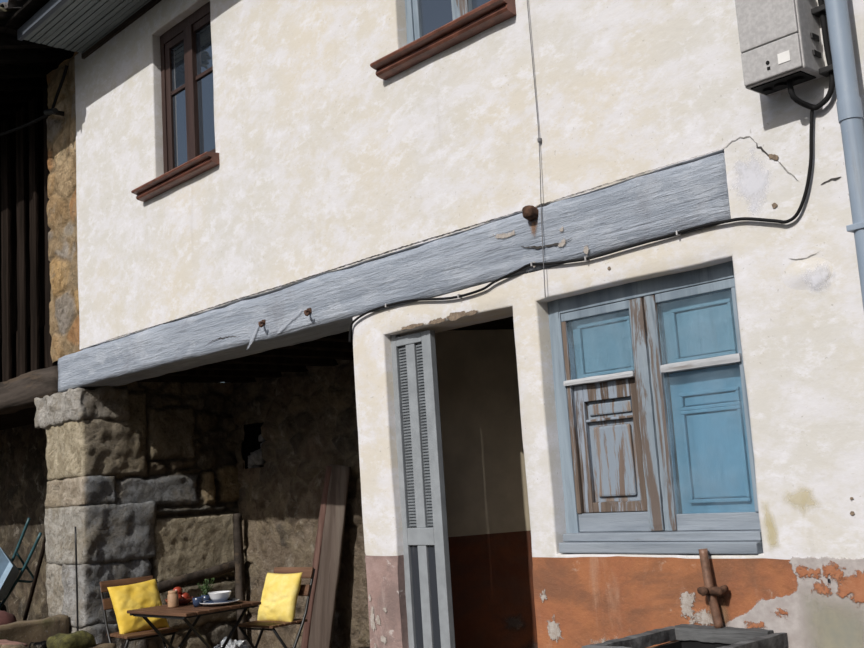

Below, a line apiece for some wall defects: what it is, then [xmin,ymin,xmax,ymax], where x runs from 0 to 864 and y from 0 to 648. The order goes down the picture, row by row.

crack [82,136,797,349]
flaking render [397,310,478,331]
peeling [368,593,387,648]
peeling [547,614,564,642]
peeling [680,557,864,648]